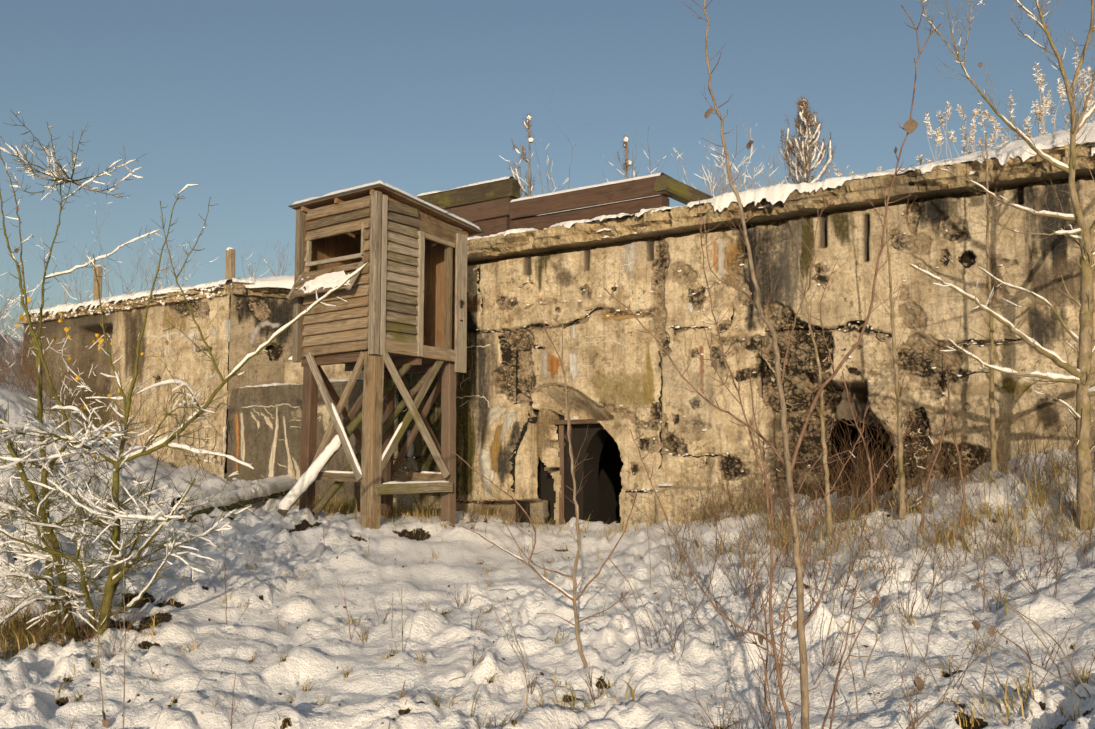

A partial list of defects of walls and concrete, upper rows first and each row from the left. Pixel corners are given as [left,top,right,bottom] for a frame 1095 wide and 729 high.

spalling [266,344,284,361]
crack [456,377,539,504]
spalling [491,295,589,404]
crack [467,266,734,493]
spalling [602,238,707,357]
spalling [598,395,712,476]
spalling [812,262,830,286]
crack [817,320,891,342]
spalling [688,281,1025,501]
damp [908,196,949,230]
spalling [888,200,978,268]
damp [1023,178,1081,350]